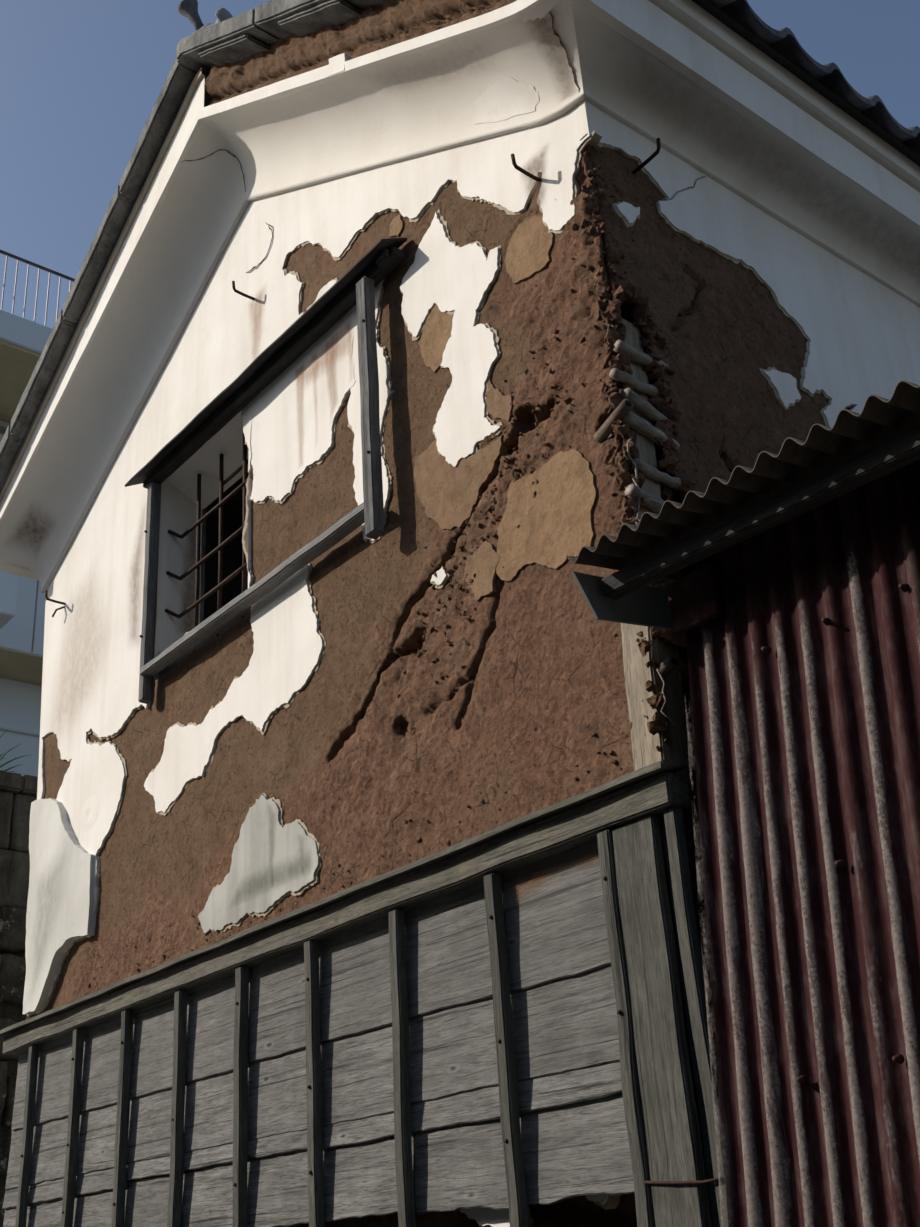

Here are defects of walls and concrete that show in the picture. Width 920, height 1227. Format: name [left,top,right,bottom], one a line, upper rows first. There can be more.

crack [549,11,579,91]
crack [182,149,246,192]
crack [246,223,273,273]
spalling [26,144,828,1020]
crack [418,526,466,602]
crack [354,649,421,733]
crack [445,670,478,701]
peeling [848,544,920,1163]
peeling [675,628,845,1227]
peeling [801,609,874,1227]
spalling [415,1207,510,1227]
spalling [528,1193,637,1227]